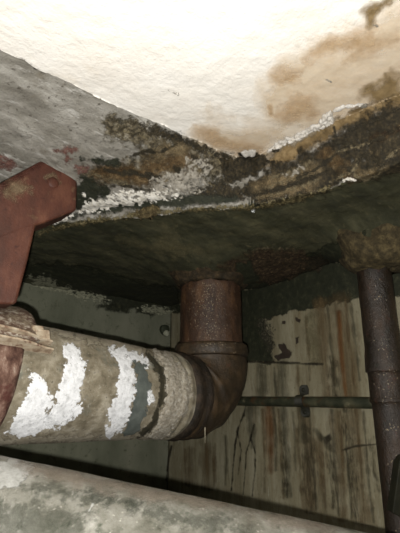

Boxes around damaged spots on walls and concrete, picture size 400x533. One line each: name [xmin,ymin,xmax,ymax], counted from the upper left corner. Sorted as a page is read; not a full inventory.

water stain [38,74,400,237]
water stain [235,242,359,368]
crack [231,410,256,496]